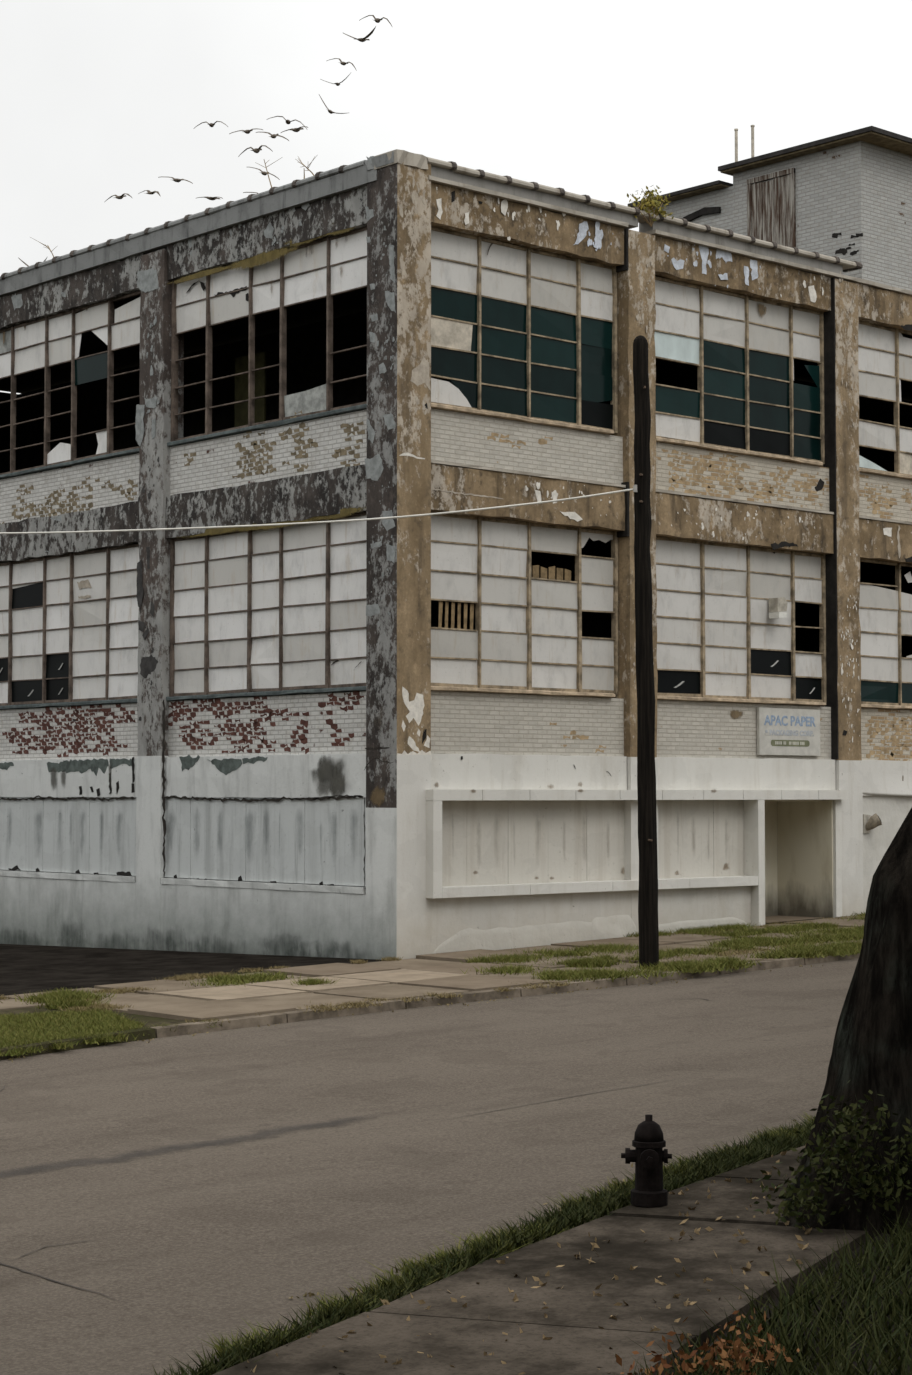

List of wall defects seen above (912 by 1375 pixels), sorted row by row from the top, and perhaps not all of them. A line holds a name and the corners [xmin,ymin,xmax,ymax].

peeling [634,244,761,338]
peeling [135,263,160,446]
flaking render [232,177,613,635]
flaking render [0,457,160,524]
flaking render [667,450,824,550]
peeling [136,547,158,687]
flaking render [840,579,912,760]
leakage [51,769,65,787]
peeling [0,704,148,797]
flaking render [168,691,364,775]
leakage [313,758,344,796]
peeling [402,686,430,752]